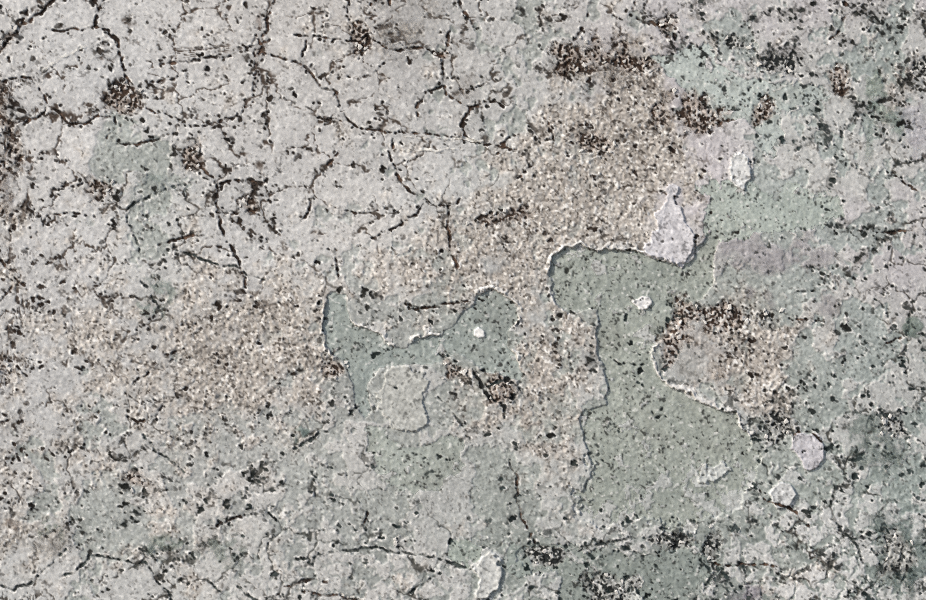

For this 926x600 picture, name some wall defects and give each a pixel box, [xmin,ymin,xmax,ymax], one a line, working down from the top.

crack [0,0,516,268]
crack [126,168,265,289]
crack [404,300,468,311]
peeling [320,284,523,494]
crack [473,369,521,419]
peeling [448,153,844,600]
crack [127,399,185,473]
crack [759,490,810,528]
crack [836,523,885,564]
crack [1,548,172,600]
crack [206,545,467,600]
crack [694,562,777,600]